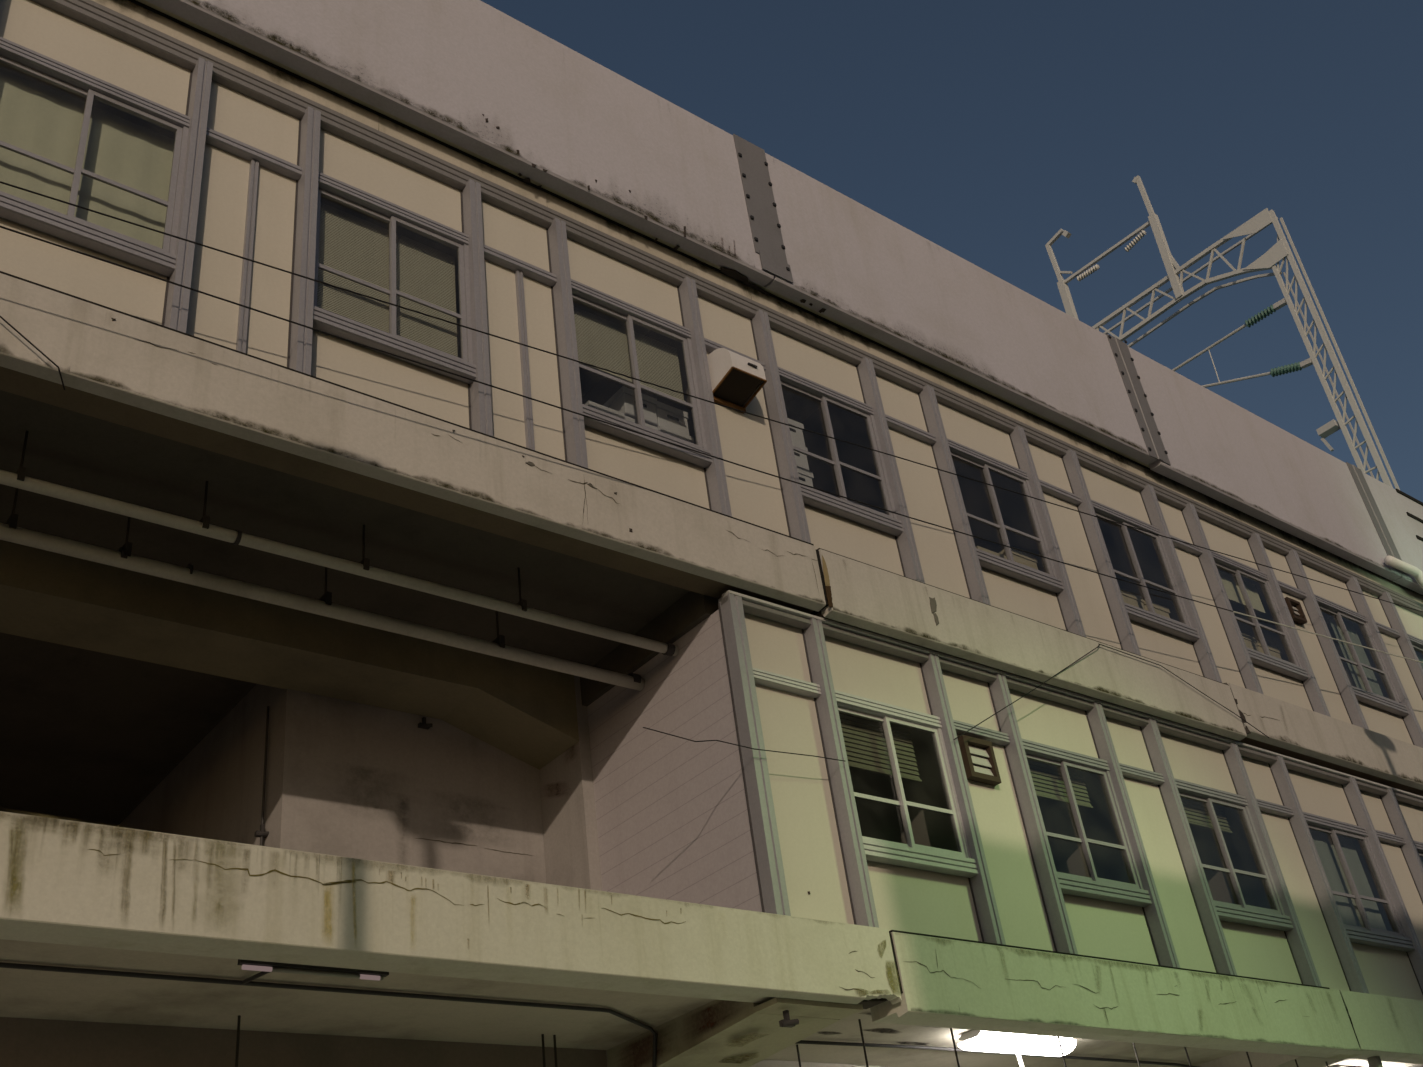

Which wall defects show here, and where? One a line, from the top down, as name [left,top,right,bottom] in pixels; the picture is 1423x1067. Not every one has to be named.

leakage [10,827,21,903]
crack [171,859,563,916]
crack [604,908,686,924]
crack [841,951,1118,1023]